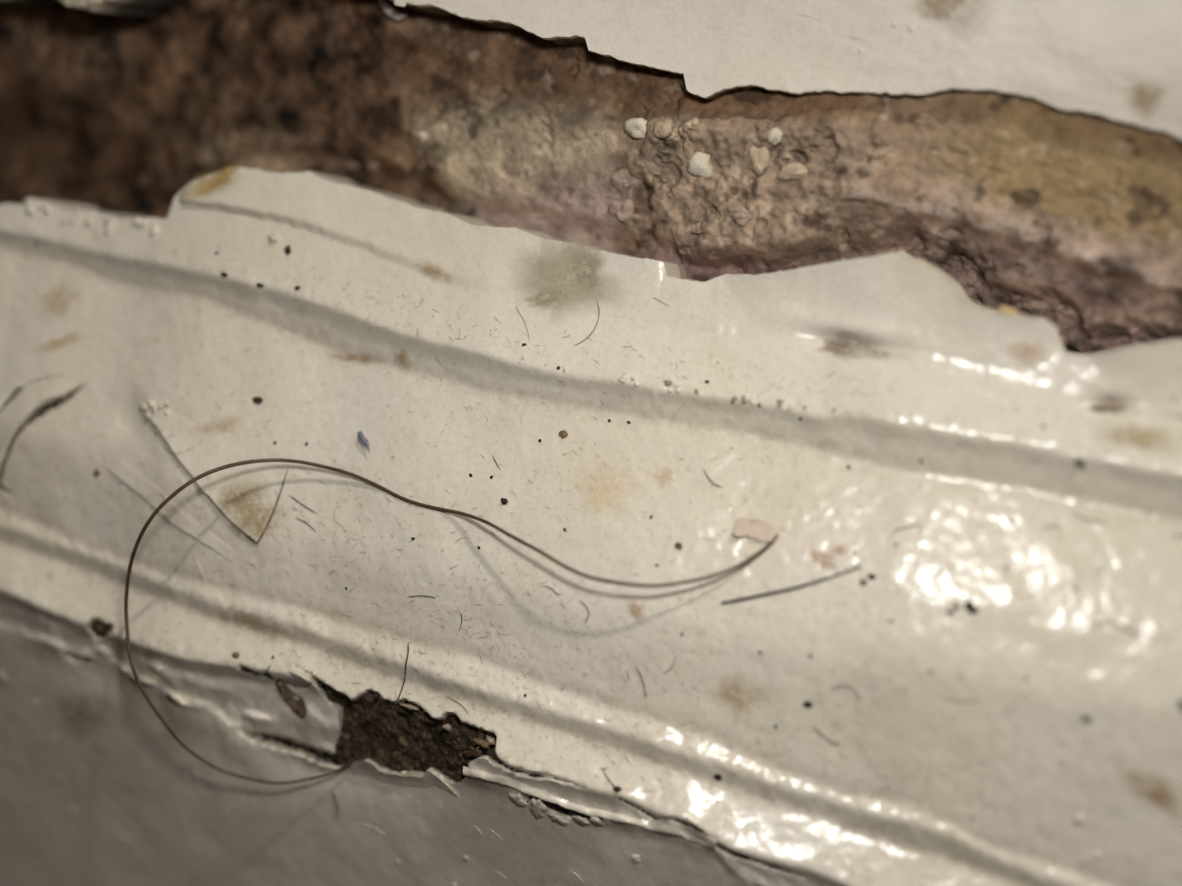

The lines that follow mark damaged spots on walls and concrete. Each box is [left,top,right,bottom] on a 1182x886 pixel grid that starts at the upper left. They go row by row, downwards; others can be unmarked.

flaking render [0,0,1182,412]
crack [0,375,86,492]
peeling [0,620,718,849]